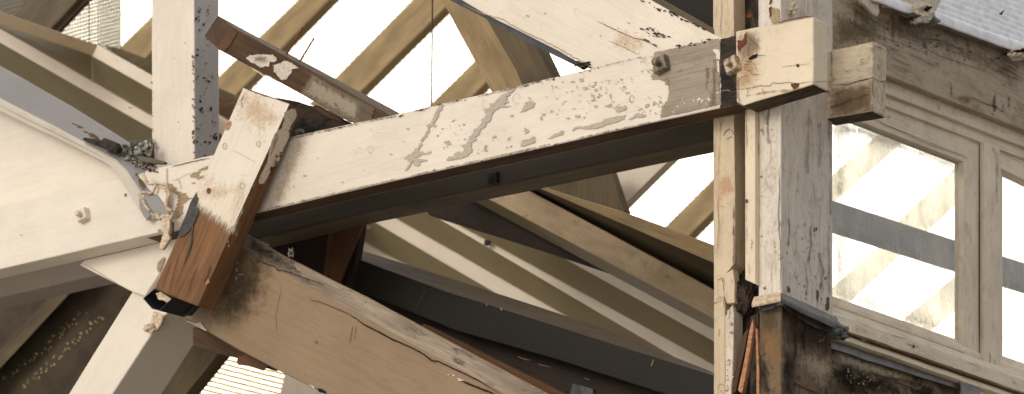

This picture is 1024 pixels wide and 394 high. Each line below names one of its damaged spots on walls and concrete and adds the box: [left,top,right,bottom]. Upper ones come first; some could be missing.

peeling [246,54,298,82]
peeling [358,0,721,180]
crack [252,257,499,394]
leakage [840,353,899,378]